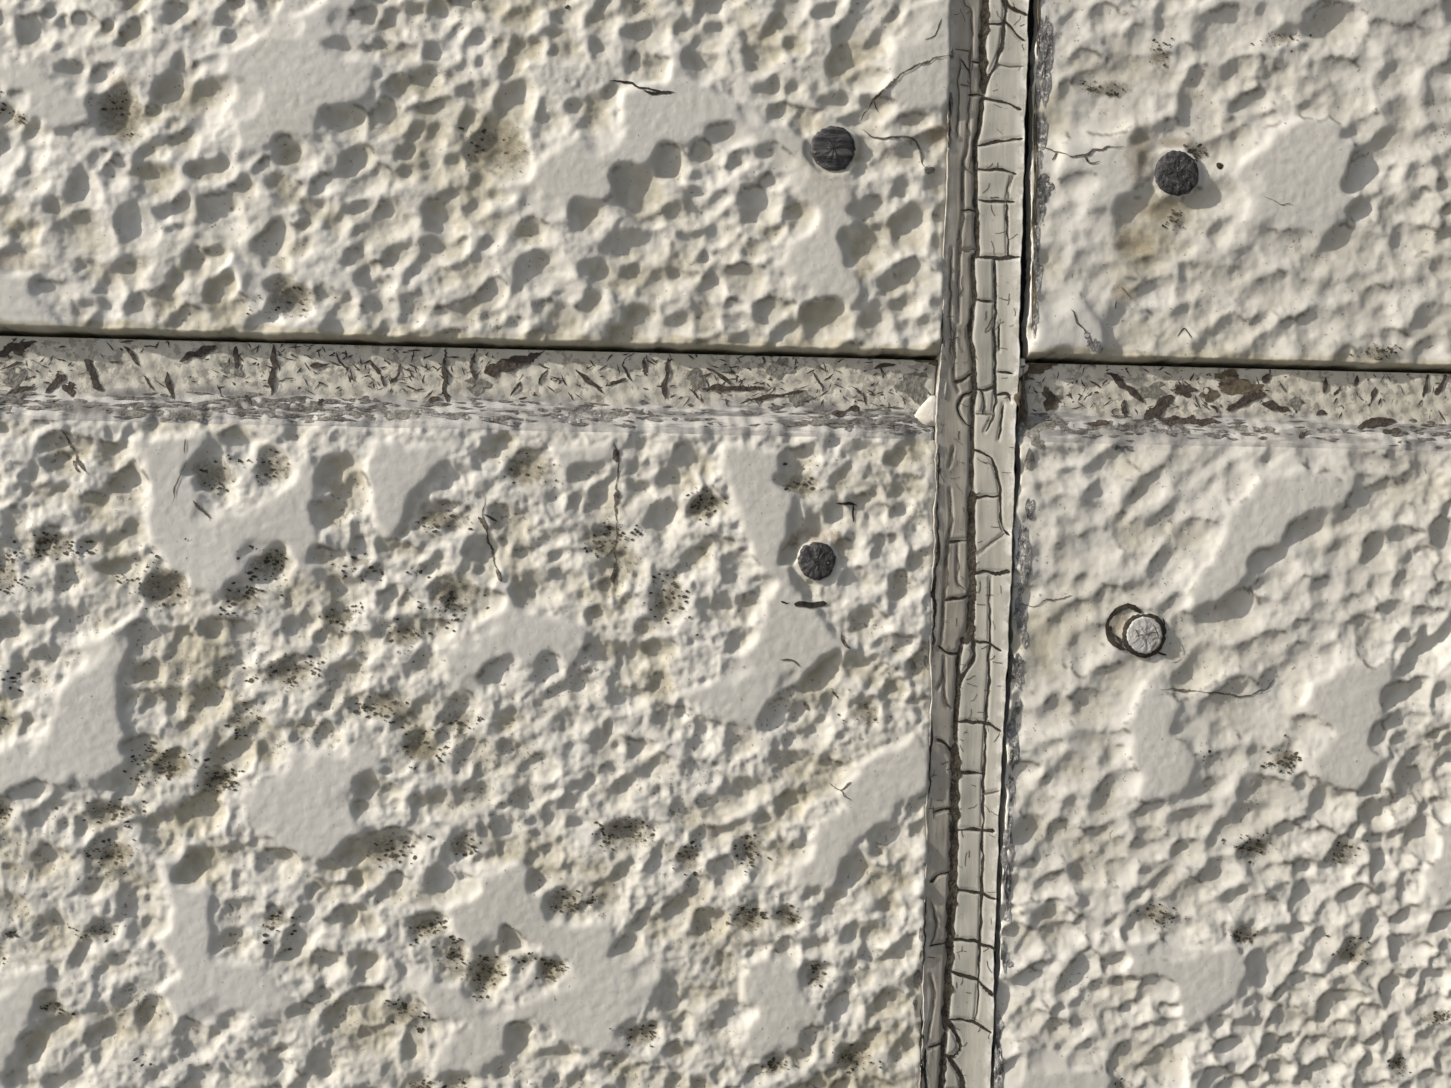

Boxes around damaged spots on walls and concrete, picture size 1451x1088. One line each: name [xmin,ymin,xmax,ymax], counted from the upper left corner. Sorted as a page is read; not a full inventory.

peeling [0,340,102,411]
spalling [111,345,243,422]
peeling [299,349,505,423]
peeling [576,356,824,408]
peeling [1014,359,1401,470]
mould [0,518,96,600]
crack [860,0,1123,1088]
water stain [318,564,467,663]
crack [1105,603,1275,698]
water stain [353,687,484,770]
mould [55,741,245,880]
mould [409,917,574,1001]